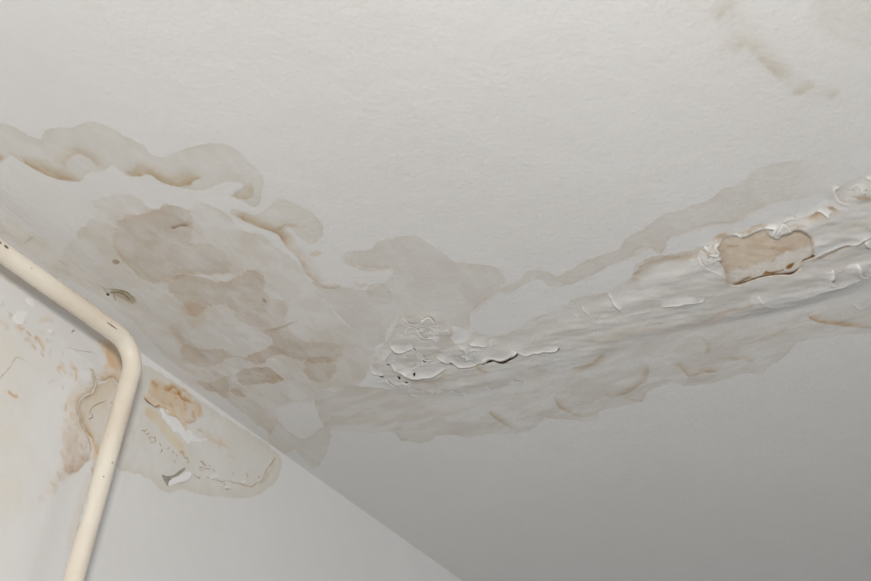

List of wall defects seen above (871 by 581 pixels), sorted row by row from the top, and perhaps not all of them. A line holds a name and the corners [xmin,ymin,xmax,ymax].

leakage [0,121,871,499]
flaking render [689,214,818,287]
peeling [810,262,871,295]
peeling [372,315,560,398]
flaking render [162,467,192,486]